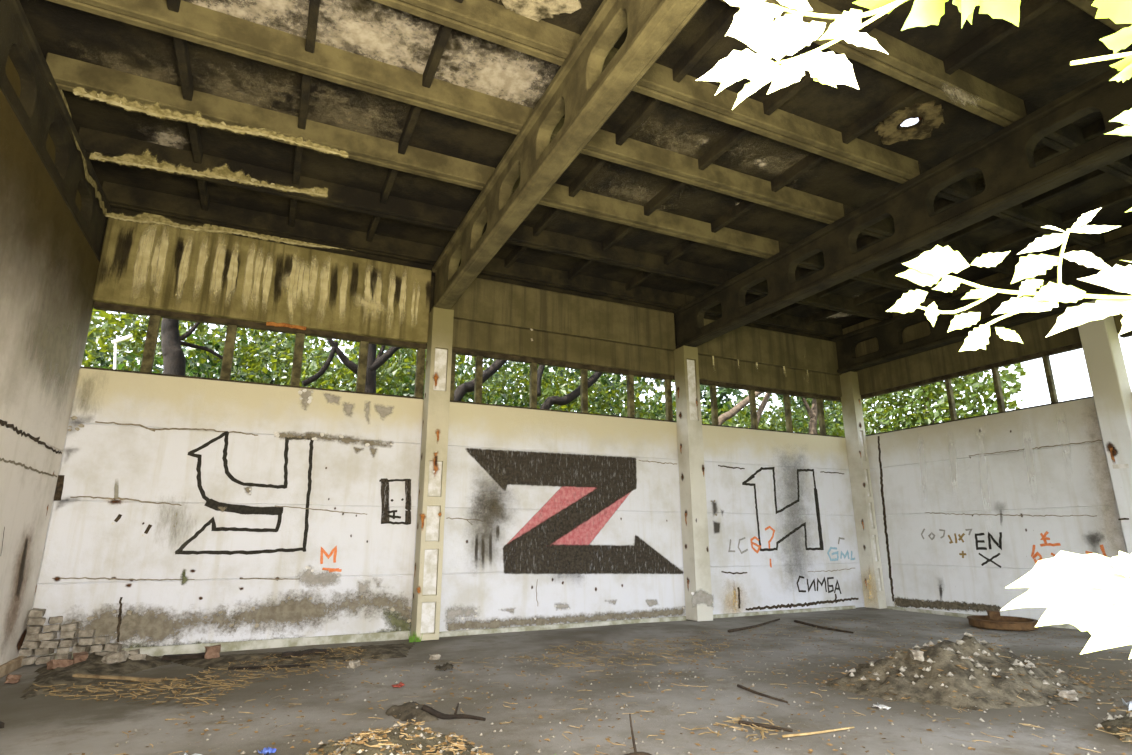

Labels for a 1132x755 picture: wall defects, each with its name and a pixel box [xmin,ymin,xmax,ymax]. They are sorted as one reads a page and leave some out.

water stain [50,83,348,158]
water stain [209,73,291,113]
water stain [72,132,432,320]
crack [0,419,181,506]
peeling [274,431,393,457]
rust [1107,442,1118,462]
water stain [8,538,31,651]
peeling [5,566,412,684]
water stain [377,612,411,633]